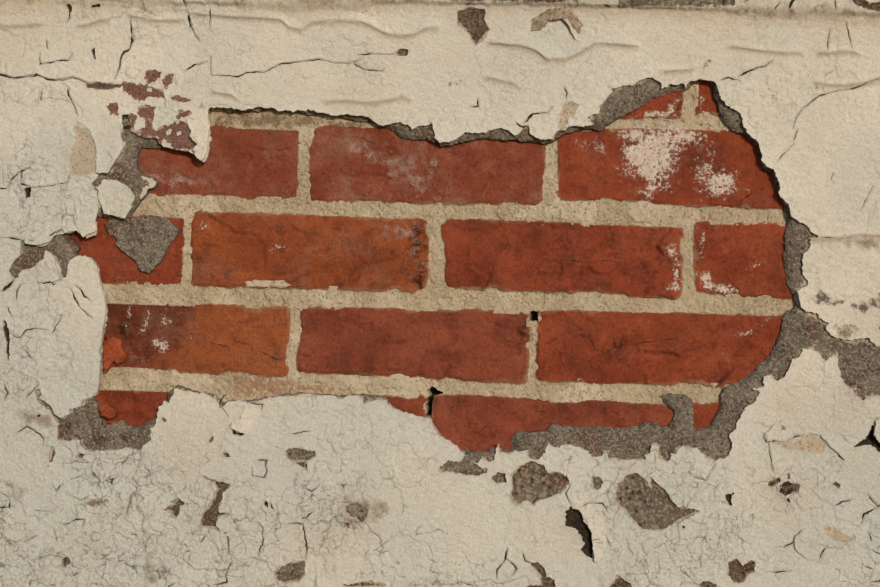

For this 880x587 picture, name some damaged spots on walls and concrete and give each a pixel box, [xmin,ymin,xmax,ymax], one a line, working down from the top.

crack [0,42,83,114]
crack [114,22,134,79]
crack [185,53,392,78]
peeling [450,0,735,46]
water stain [617,99,749,200]
peeling [5,69,276,459]
crack [3,280,92,358]
flaking render [283,78,880,564]
flaking render [167,385,405,434]
peeling [165,498,188,518]
peeling [200,476,231,550]
crack [835,495,880,583]